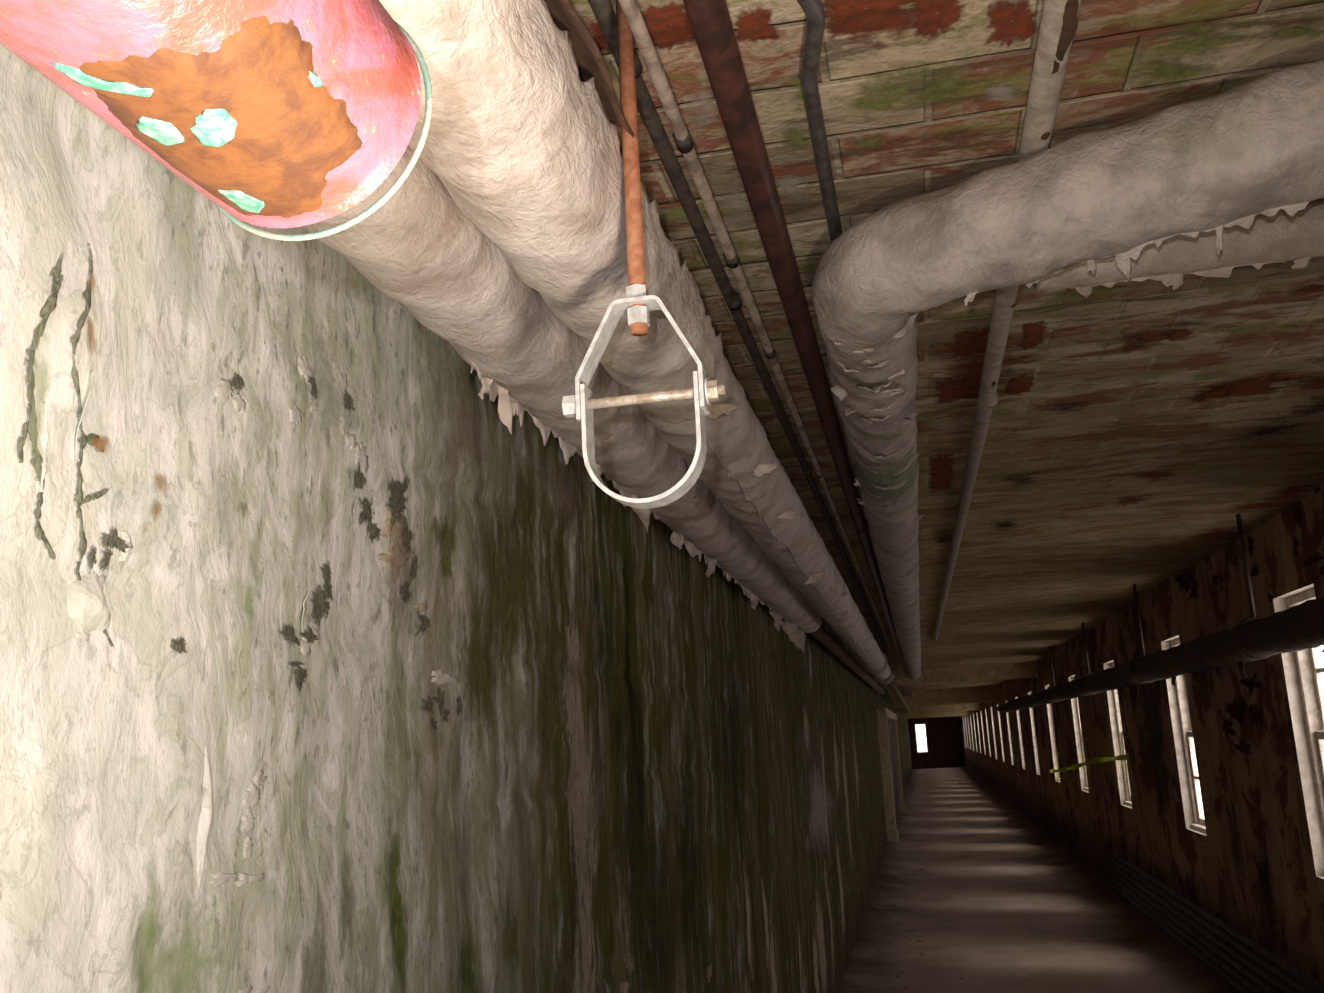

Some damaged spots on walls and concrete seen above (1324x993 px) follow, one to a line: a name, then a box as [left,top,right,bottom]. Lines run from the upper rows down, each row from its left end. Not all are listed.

peeling [824,0,964,47]
peeling [987,0,1036,46]
peeling [214,374,246,412]
peeling [924,321,1046,403]
peeling [289,355,430,637]
spalling [279,561,333,697]
damp [459,613,496,738]
damp [391,837,399,877]
damp [538,582,707,993]
damp [797,706,859,993]
damp [394,908,408,990]
damp [743,862,778,993]